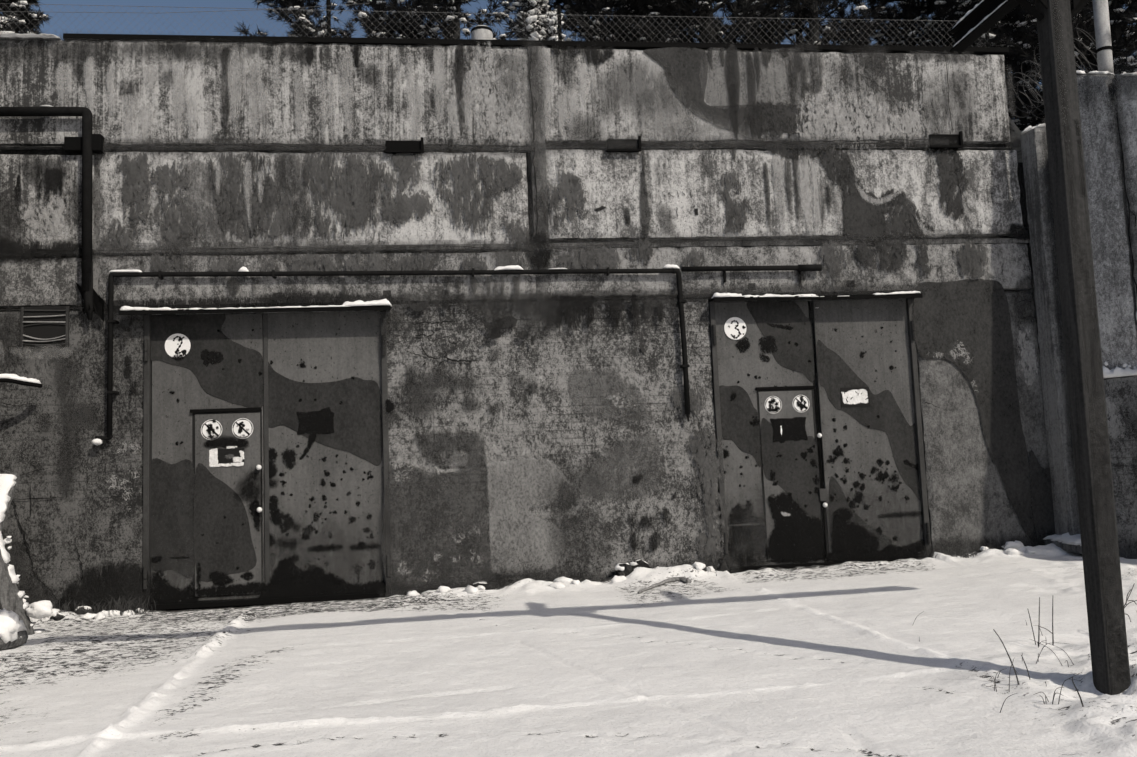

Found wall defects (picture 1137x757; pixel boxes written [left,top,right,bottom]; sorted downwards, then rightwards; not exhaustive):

leakage [538,45,613,137]
leakage [708,43,823,162]
leakage [276,155,307,238]
leakage [556,149,656,276]
leakage [764,156,837,230]
leakage [71,224,952,342]
leakage [124,356,136,393]
leakage [389,368,500,421]
leakage [388,584,470,596]
leakage [487,568,617,589]
leakage [628,508,671,552]
leakage [694,551,739,573]